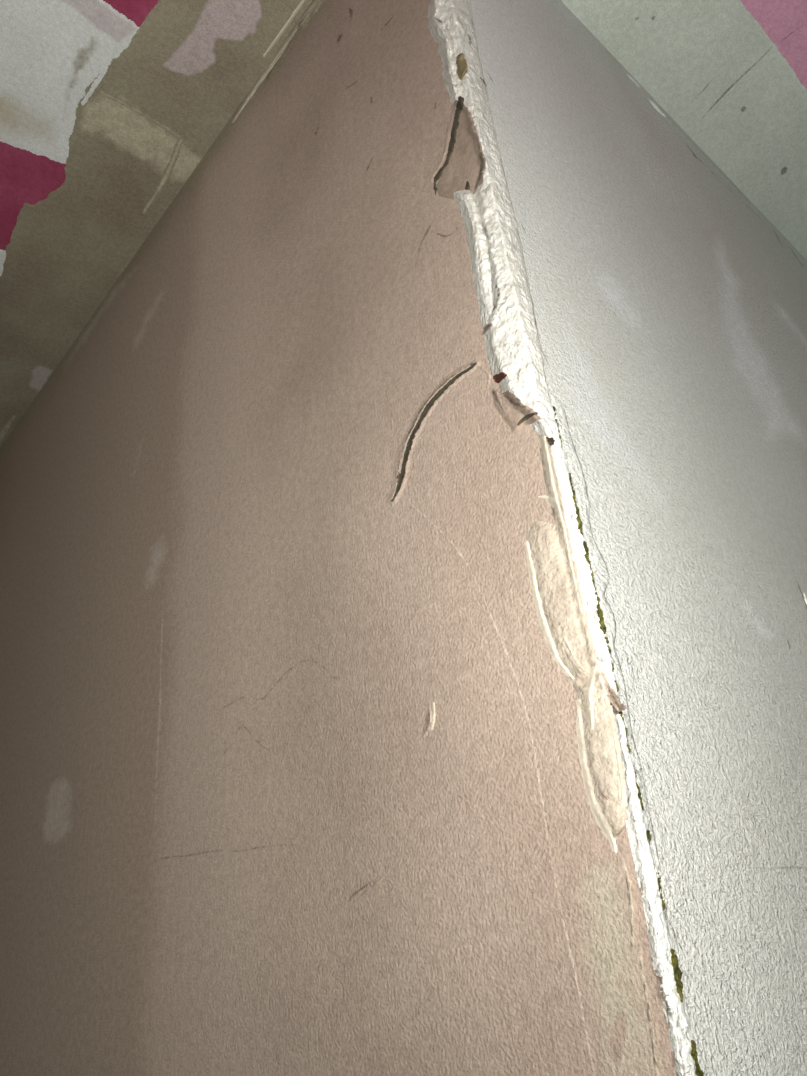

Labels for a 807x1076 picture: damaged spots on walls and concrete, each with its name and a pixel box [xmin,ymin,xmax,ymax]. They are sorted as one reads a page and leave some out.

spalling [456,33,473,80]
crack [385,359,482,506]